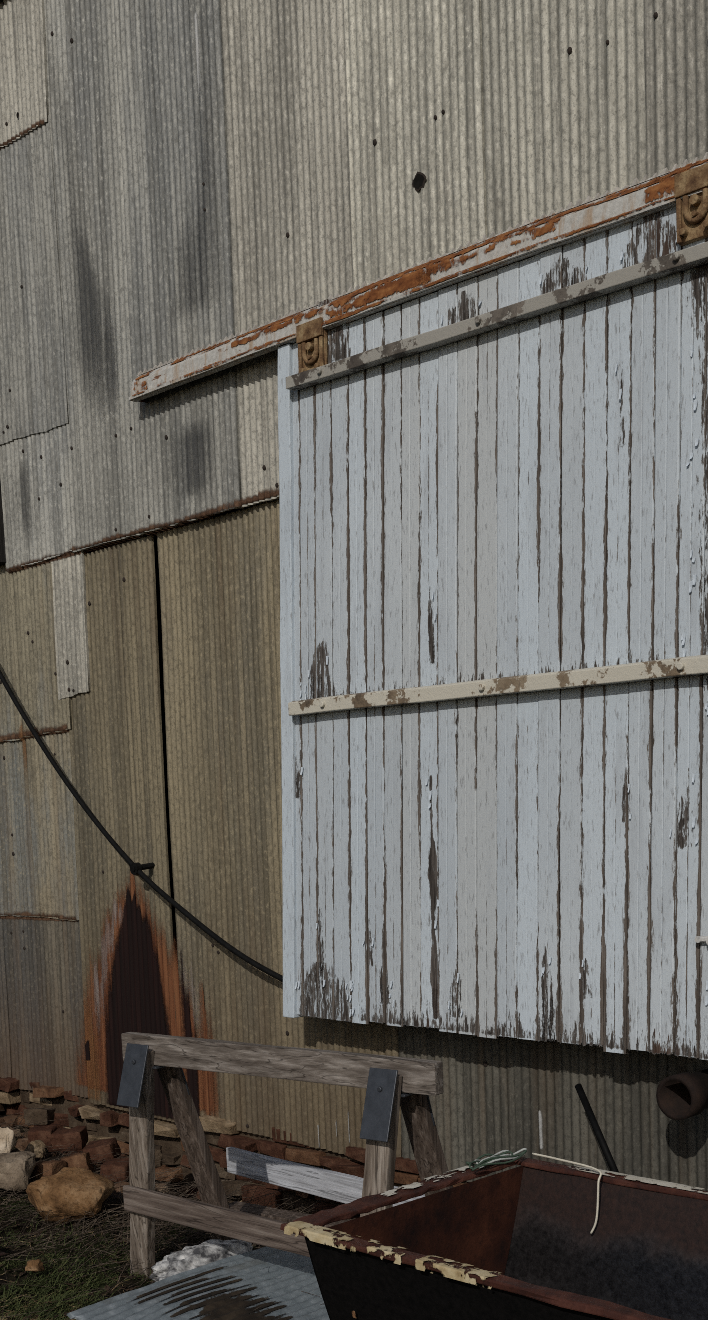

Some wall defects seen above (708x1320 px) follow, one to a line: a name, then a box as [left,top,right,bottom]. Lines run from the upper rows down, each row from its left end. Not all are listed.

peeling [620,210,677,268]
corrosion [132,159,708,396]
peeling [539,257,588,294]
peeling [300,263,708,700]
peeling [295,743,303,798]
corrosion [0,912,78,922]
peeling [295,767,708,1060]
corrosion [77,871,212,1109]
corrosion [182,1068,218,1116]